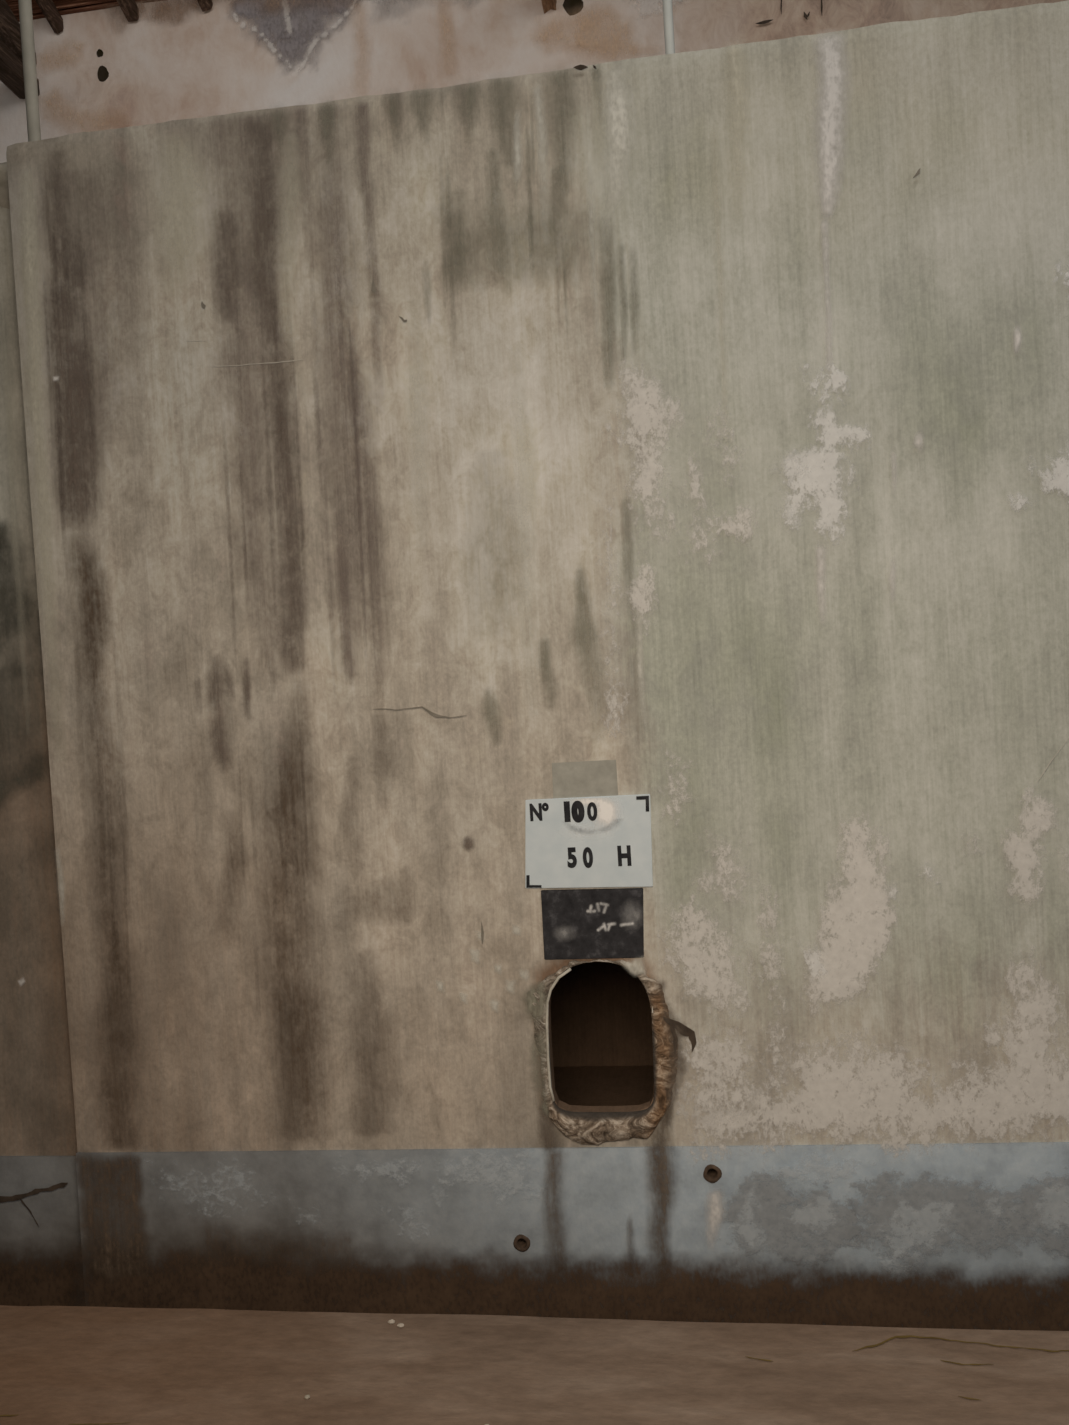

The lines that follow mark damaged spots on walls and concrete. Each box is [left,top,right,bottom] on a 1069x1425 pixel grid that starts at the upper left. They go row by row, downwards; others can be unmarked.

water stain [595,68,632,203]
water stain [818,35,846,365]
water stain [23,193,93,556]
peeling [606,360,757,564]
peeling [782,364,871,542]
peeling [1030,444,1069,502]
water stain [79,556,103,681]
peeling [604,527,659,737]
peeling [1001,788,1059,905]
peeling [508,814,1069,1180]
crack [0,1182,68,1227]
water stain [0,913,1069,1331]